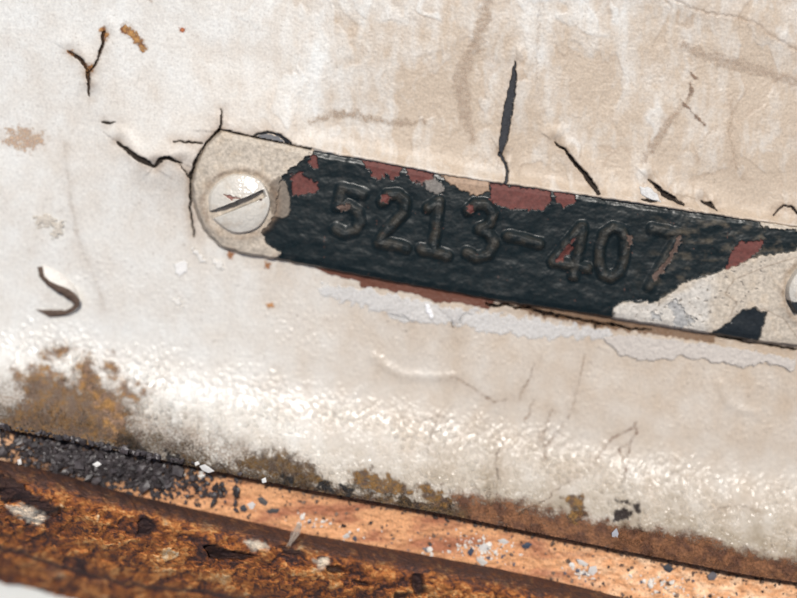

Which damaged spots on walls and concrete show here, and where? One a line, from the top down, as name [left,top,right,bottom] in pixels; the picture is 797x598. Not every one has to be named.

crack [68,31,105,96]
corrosion [120,25,147,53]
crack [498,61,517,184]
crack [101,109,312,237]
crack [555,142,600,195]
crack [641,179,718,211]
peeling [36,265,80,317]
spalling [315,267,796,372]
corrosion [0,346,797,598]